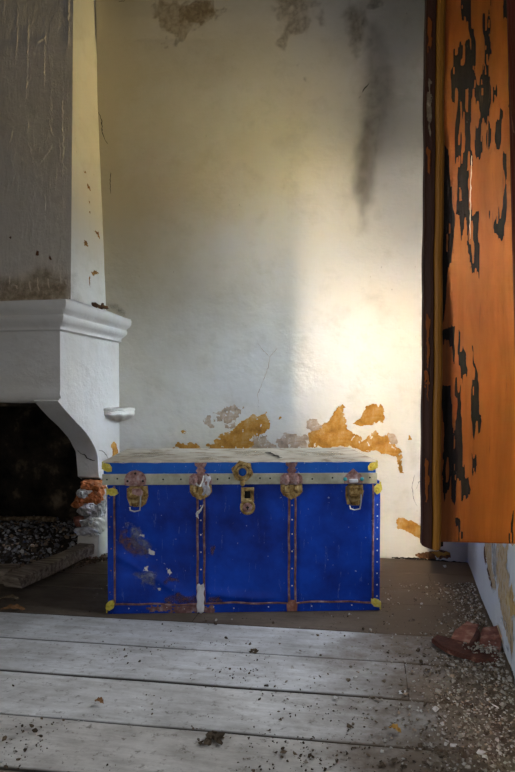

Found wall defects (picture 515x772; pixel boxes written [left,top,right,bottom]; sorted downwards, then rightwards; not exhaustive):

peeling [172,403,412,476]
peeling [394,516,421,539]
peeling [415,549,453,568]
spalling [431,510,515,667]